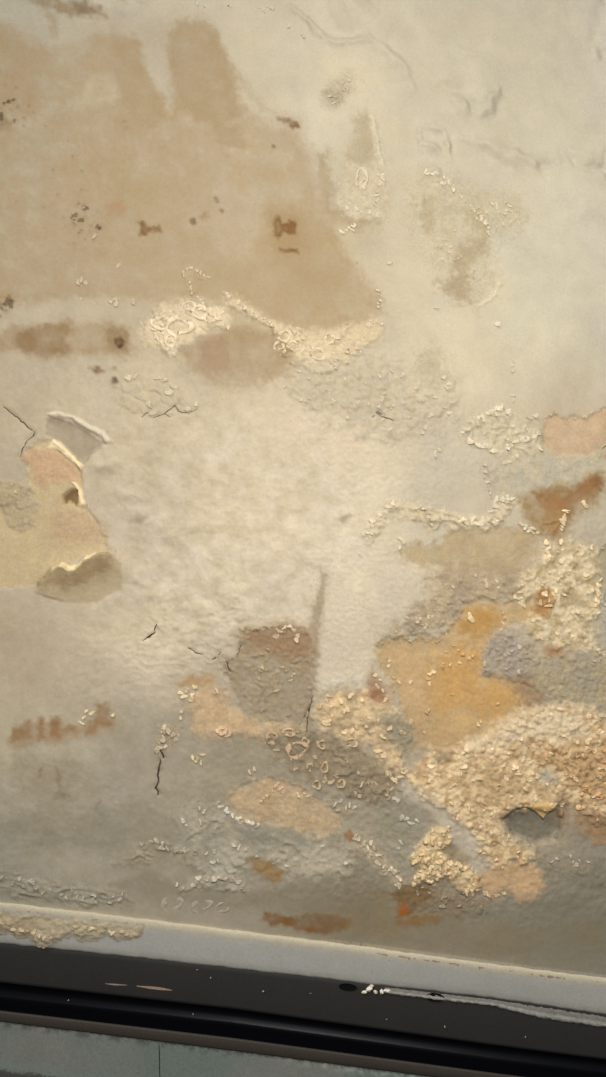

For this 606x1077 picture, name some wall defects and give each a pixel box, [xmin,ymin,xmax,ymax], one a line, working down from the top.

leakage [0,0,394,339]
flaking render [0,410,125,604]
flaking render [149,399,606,766]
peeling [0,838,251,949]
flaking render [216,741,606,910]